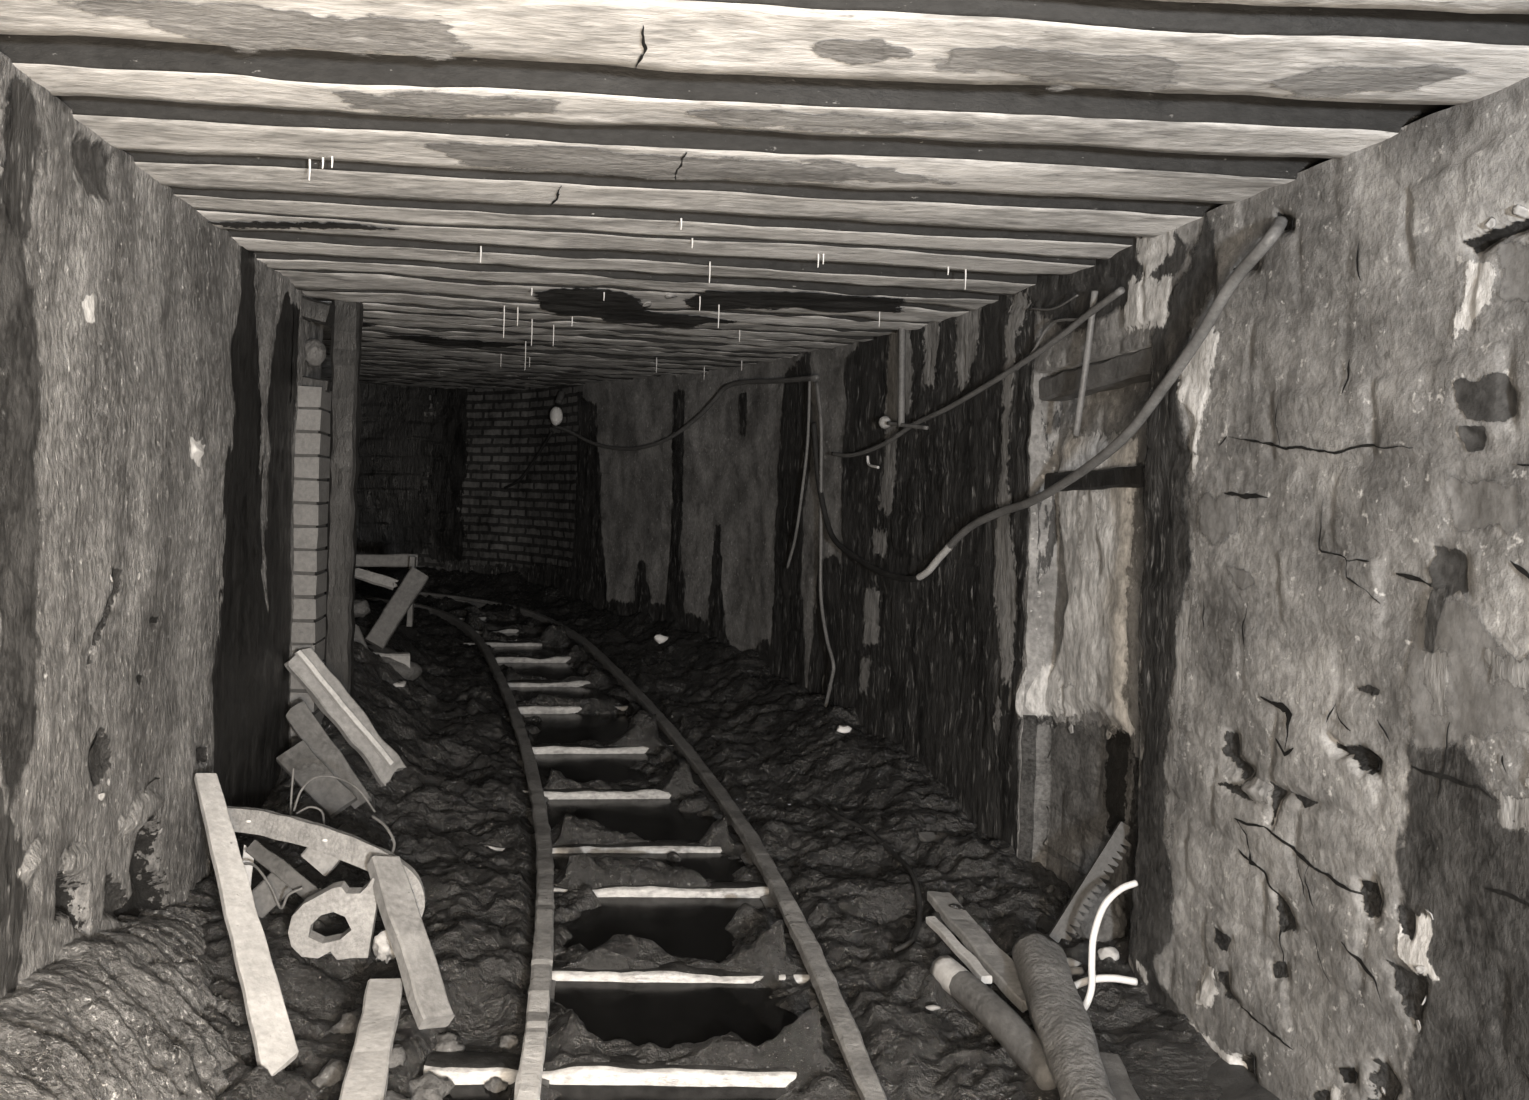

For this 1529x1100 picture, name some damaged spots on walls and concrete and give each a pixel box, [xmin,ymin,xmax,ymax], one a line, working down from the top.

damp [58,0,471,61]
damp [812,39,914,65]
damp [936,46,1180,92]
spalling [1463,204,1529,302]
crack [1219,400,1413,455]
spalling [1453,372,1517,453]
crack [1318,503,1447,604]
damp [356,213,1238,1015]
spalling [1337,742,1383,775]
crack [1260,696,1506,803]
crack [1234,818,1381,1001]
spalling [1314,1059,1402,1100]